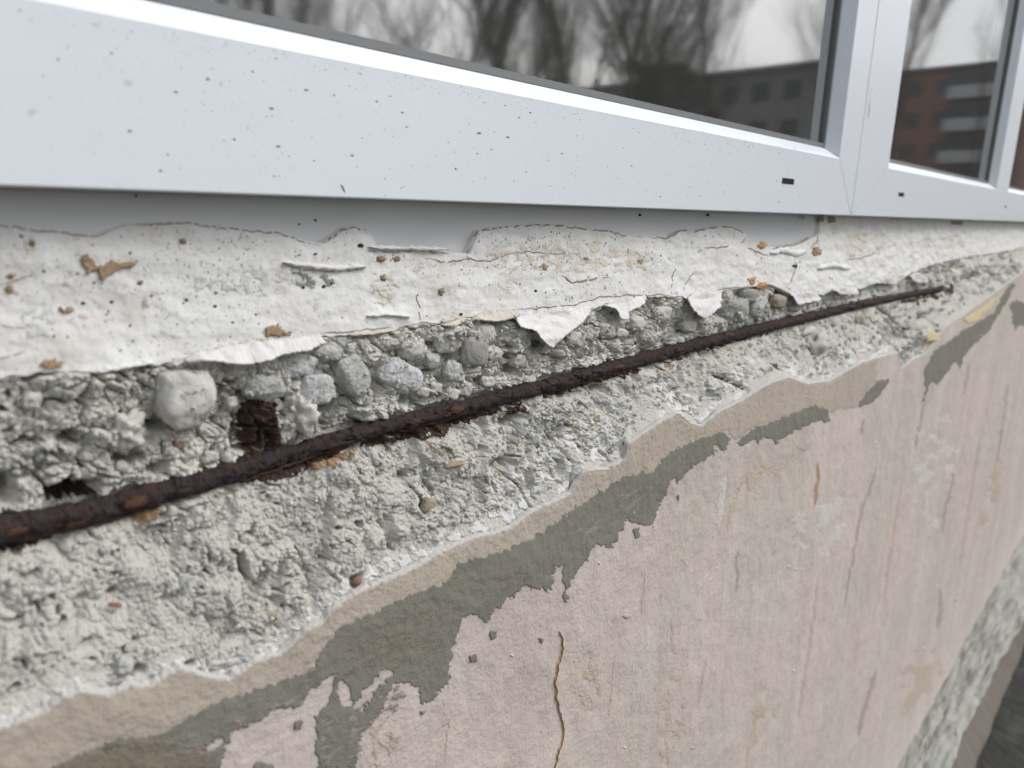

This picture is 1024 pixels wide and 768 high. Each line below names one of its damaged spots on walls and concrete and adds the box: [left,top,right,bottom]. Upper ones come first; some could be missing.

rust [896,283,955,305]
rust [657,333,768,371]
rust [543,368,642,399]
rust [232,398,282,457]
rust [240,400,529,485]
rust [43,478,98,501]
rust [131,507,164,523]
spalling [0,247,1024,768]
rust [0,527,62,552]
crack [555,632,565,768]